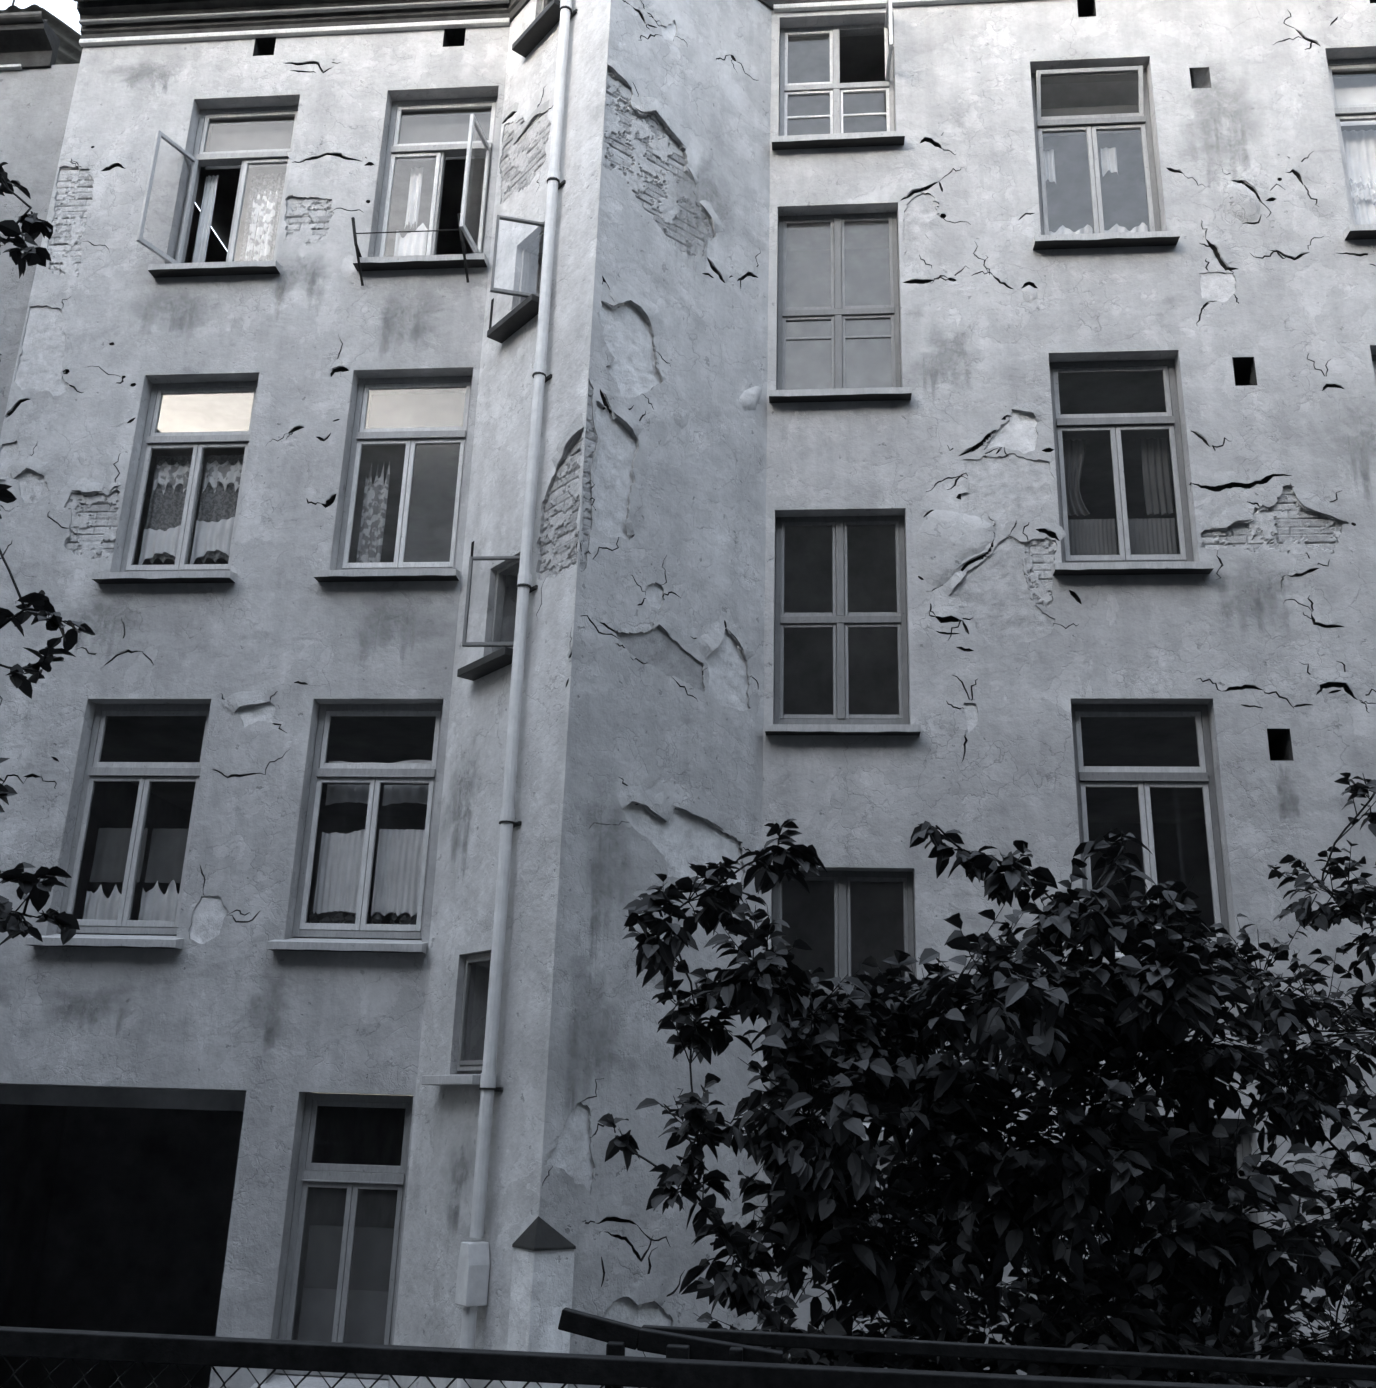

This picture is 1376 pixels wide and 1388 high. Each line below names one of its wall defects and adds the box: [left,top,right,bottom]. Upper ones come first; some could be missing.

crack [1273,12,1338,50]
spalling [46,144,131,277]
spalling [499,88,553,205]
spalling [603,55,730,283]
crack [892,131,961,219]
crack [1166,152,1376,274]
spalling [536,274,671,616]
spalling [926,402,1089,652]
spalling [1189,462,1357,580]
crack [1281,553,1345,628]
crack [1198,661,1376,713]
spalling [590,777,751,885]